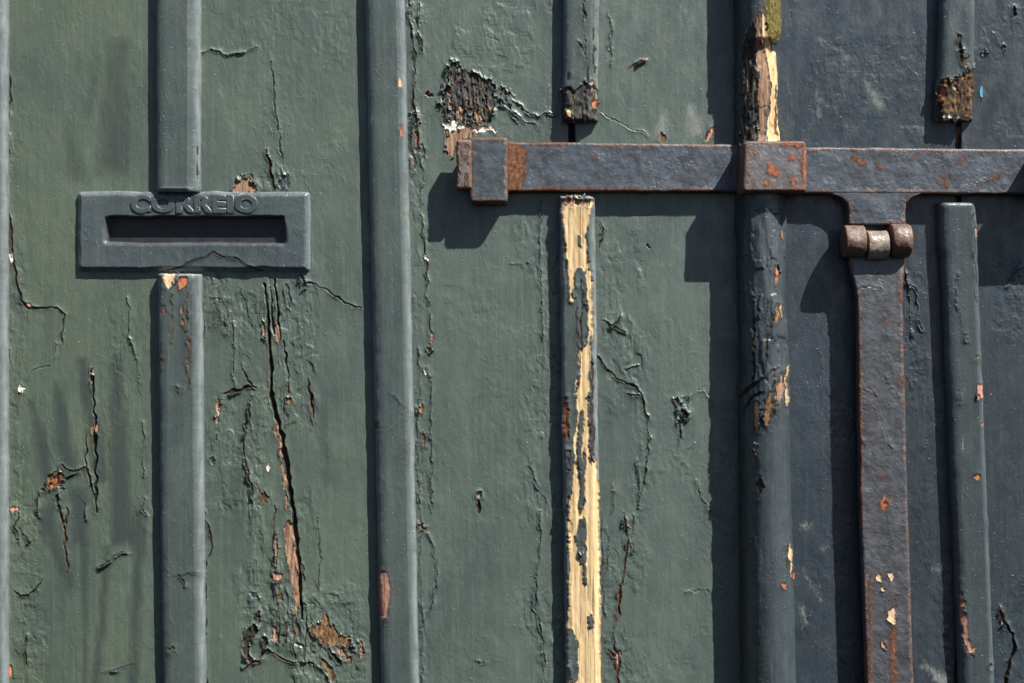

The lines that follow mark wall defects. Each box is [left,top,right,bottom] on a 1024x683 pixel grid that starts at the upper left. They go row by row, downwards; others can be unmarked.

crack [202,47,284,192]
peeling [436,60,513,133]
rust [457,137,647,203]
peeling [737,12,779,147]
rust [763,142,807,192]
peeling [933,34,990,145]
crack [9,214,65,343]
crack [9,368,98,597]
crack [167,251,362,682]
crack [530,203,651,683]
peeling [744,364,790,456]
peeling [243,419,365,682]